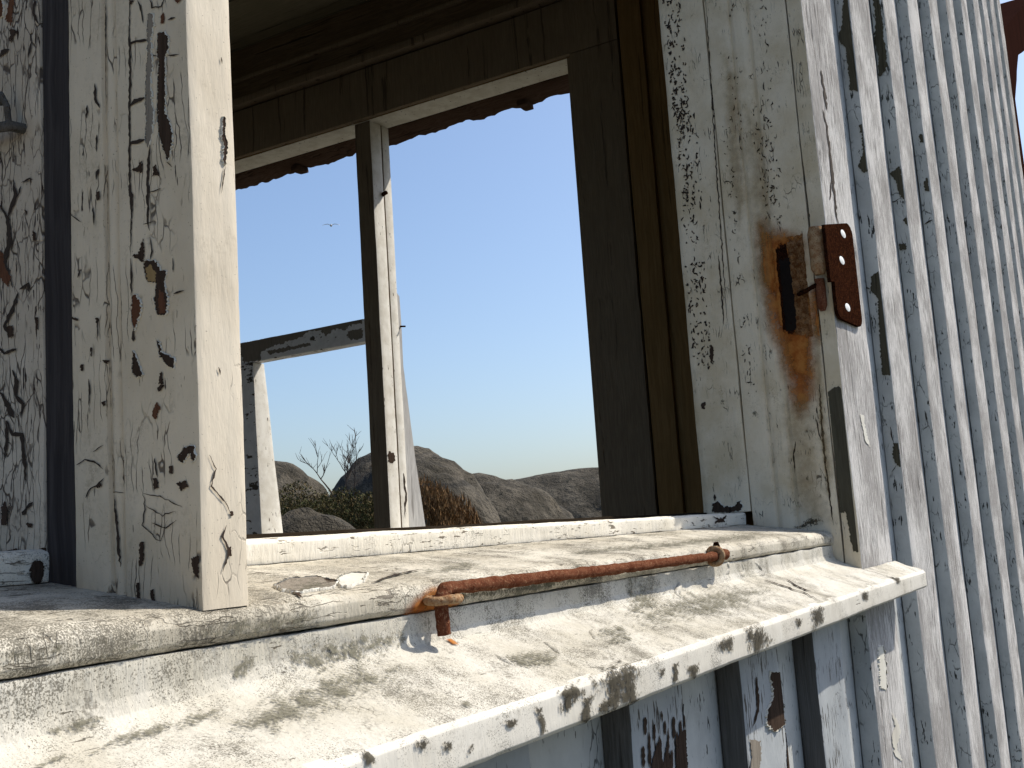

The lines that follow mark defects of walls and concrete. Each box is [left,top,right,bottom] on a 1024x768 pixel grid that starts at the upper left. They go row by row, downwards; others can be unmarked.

peeling [129,0,184,378]
crack [0,178,38,484]
corrosion [758,224,822,411]
crack [71,316,180,567]
crack [209,455,234,570]
peeling [828,386,858,552]
peeling [273,569,419,598]
corrosion [401,588,437,615]
peeling [642,704,688,768]
peeling [750,740,762,768]
peeling [753,670,790,768]